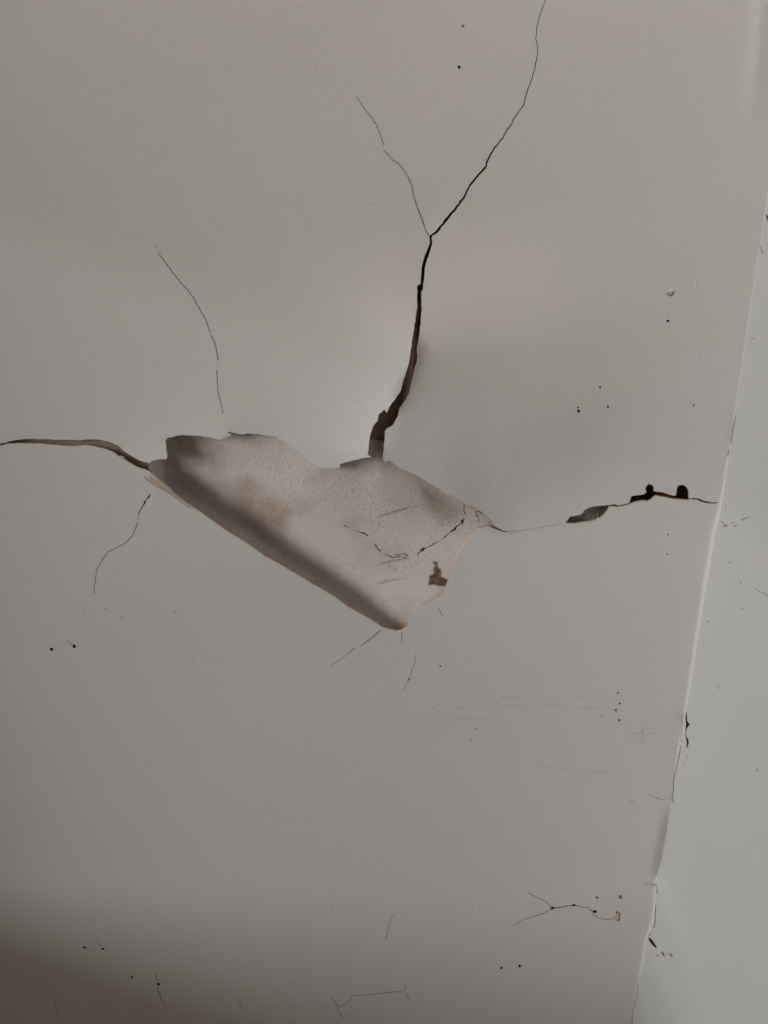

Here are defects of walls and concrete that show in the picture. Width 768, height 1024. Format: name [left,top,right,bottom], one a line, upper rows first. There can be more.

crack [356,0,546,458]
crack [155,245,223,412]
crack [0,439,150,587]
flaking render [132,432,512,631]
crack [566,484,748,527]
crack [516,893,620,924]